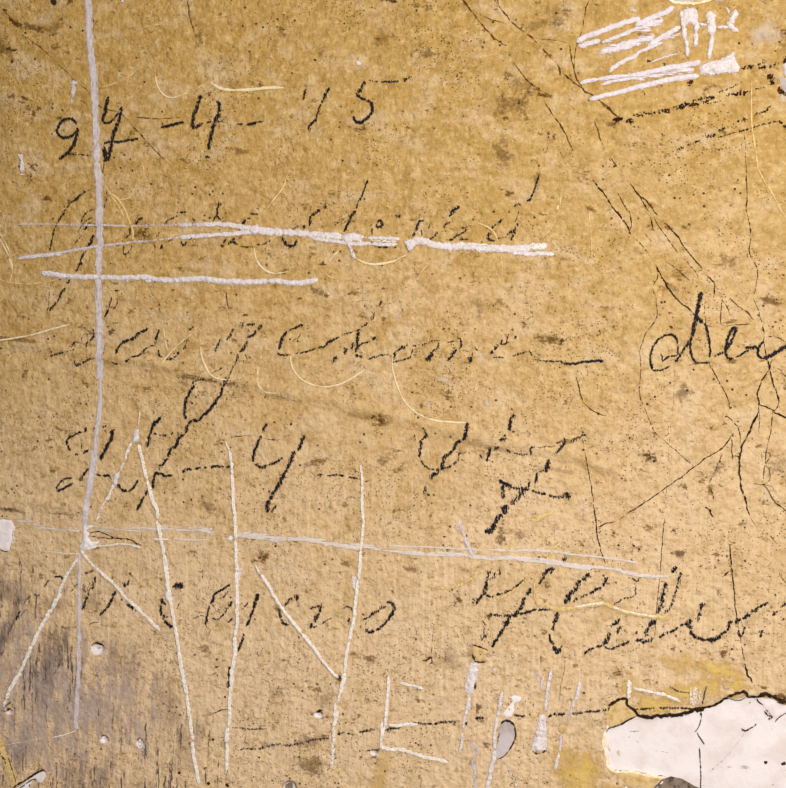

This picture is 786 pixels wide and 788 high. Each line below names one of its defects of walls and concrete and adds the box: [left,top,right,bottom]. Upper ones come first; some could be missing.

peeling [669,0,711,26]
crack [462,0,621,166]
crack [582,135,786,564]
crack [654,519,665,639]
crack [722,545,752,682]
peeling [602,690,786,788]